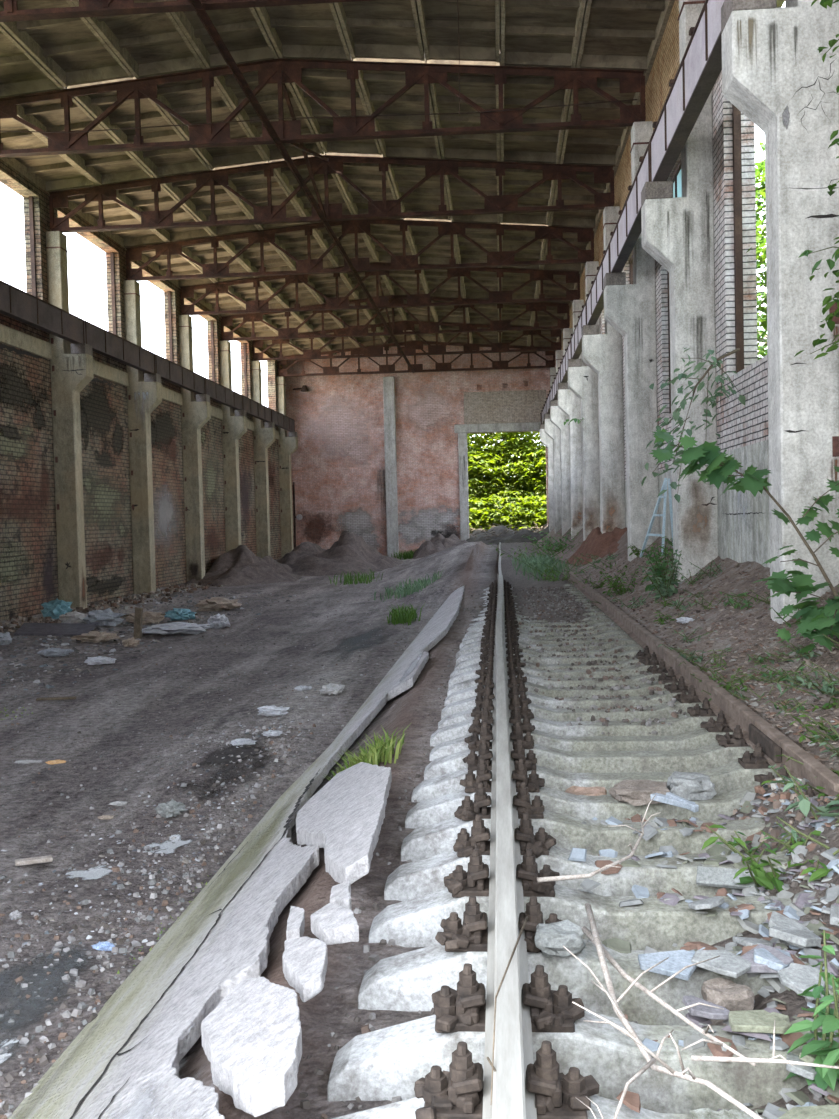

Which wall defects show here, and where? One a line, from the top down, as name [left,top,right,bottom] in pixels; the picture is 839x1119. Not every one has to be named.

damp [737,19,754,55]
crack [792,62,839,130]
damp [240,472,251,528]
crack [69,768,321,1119]